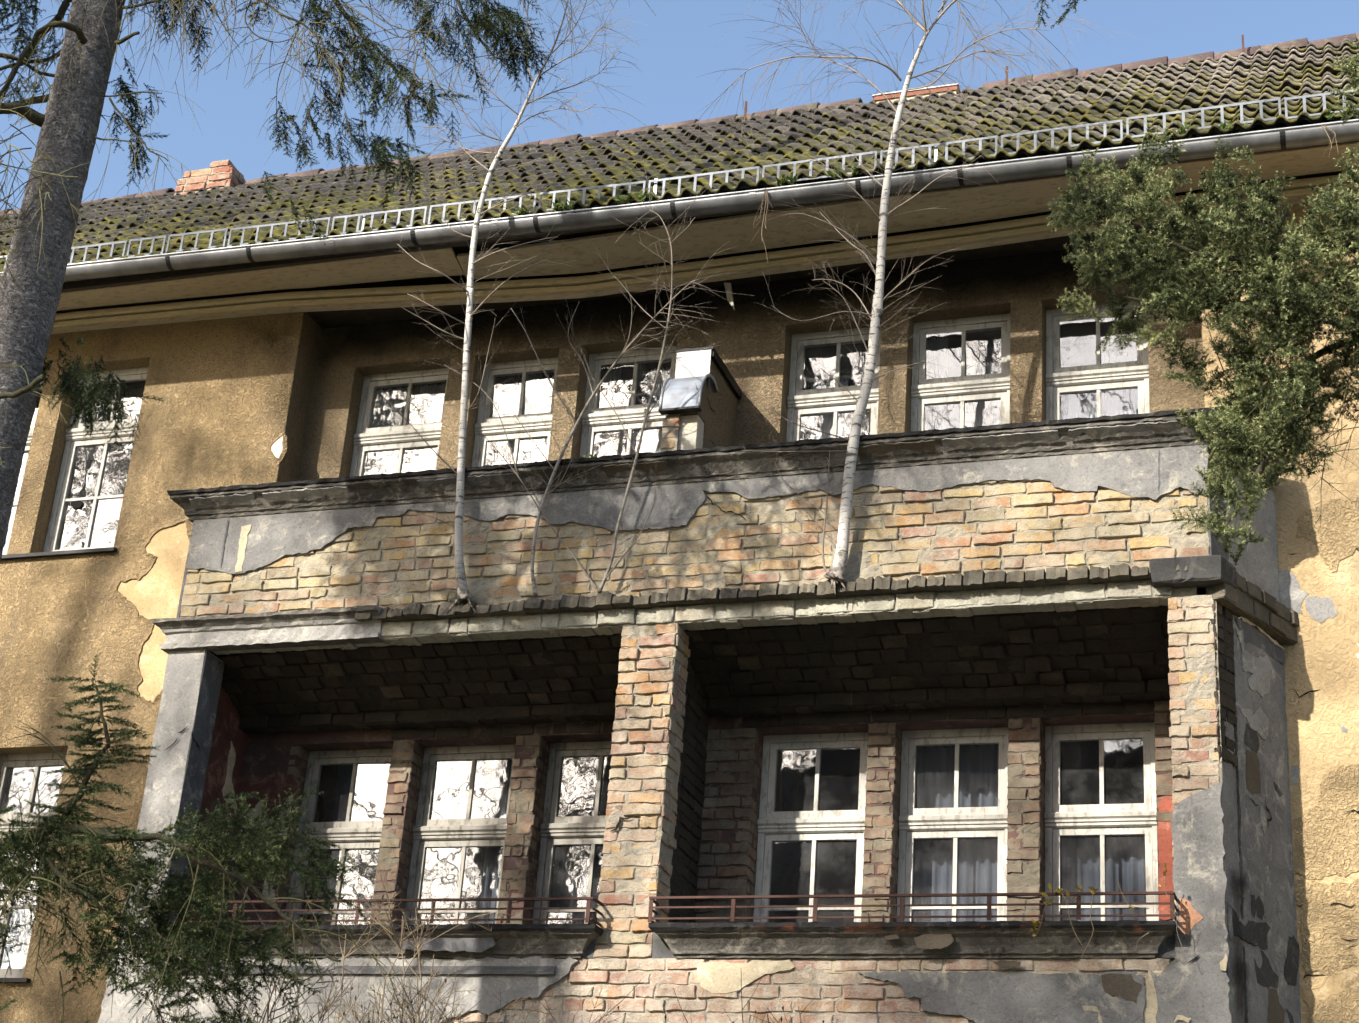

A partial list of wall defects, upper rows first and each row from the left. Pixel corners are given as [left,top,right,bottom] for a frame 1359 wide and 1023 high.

flaking render [268,433,287,462]
spalling [114,479,1210,706]
peeling [219,736,298,910]
peeling [397,938,496,960]
spalling [443,934,1171,1023]
flaking render [1174,898,1204,935]
peeling [1220,764,1359,1023]